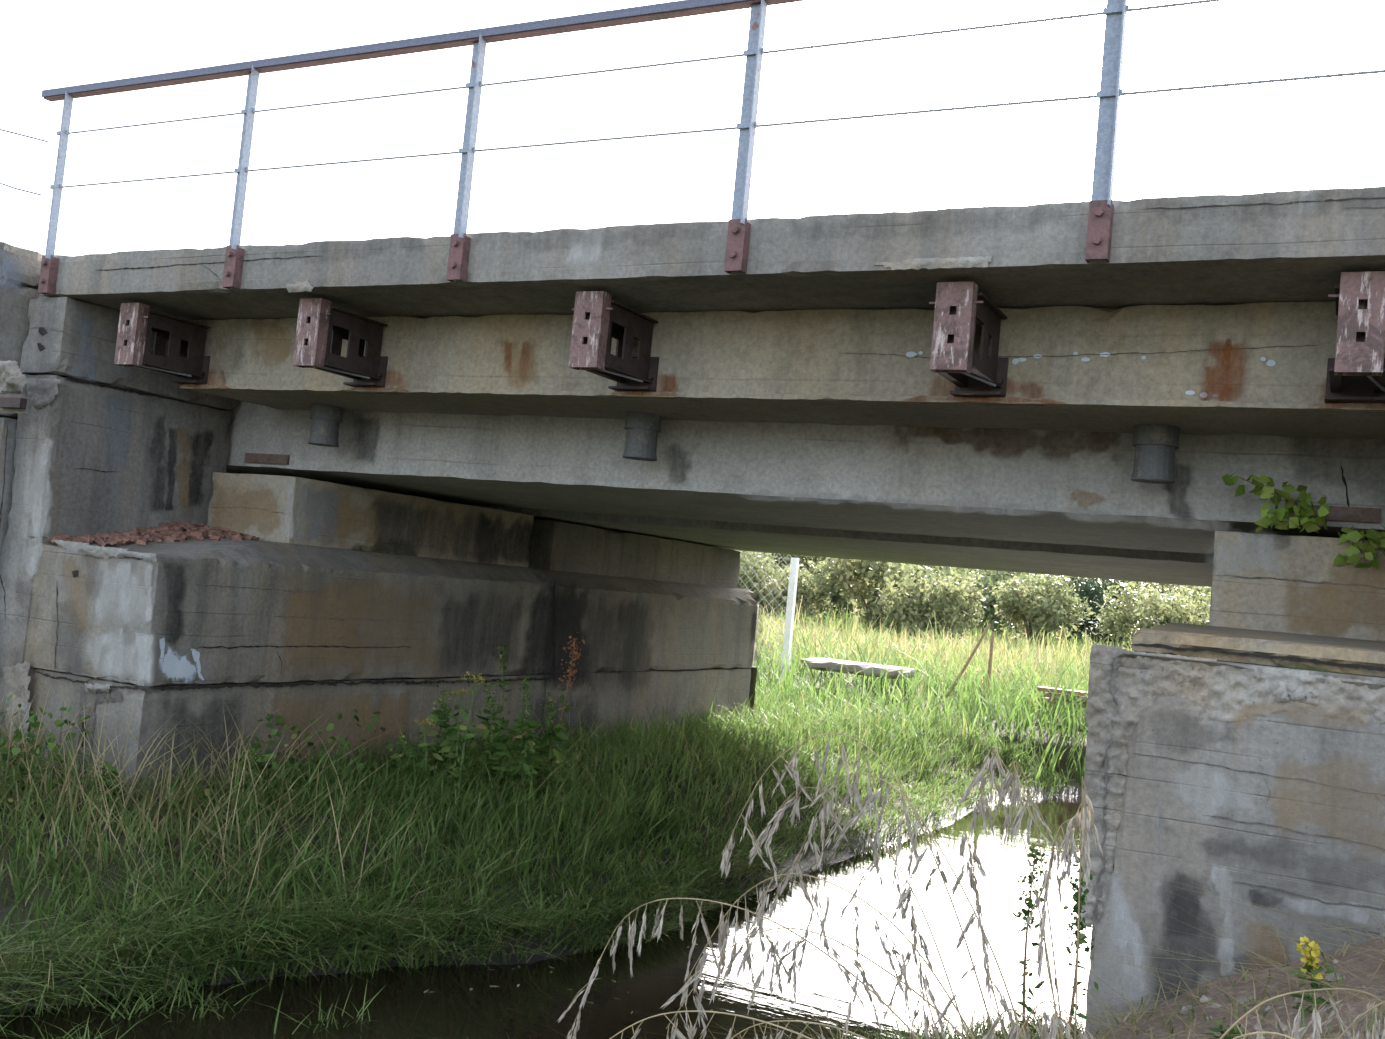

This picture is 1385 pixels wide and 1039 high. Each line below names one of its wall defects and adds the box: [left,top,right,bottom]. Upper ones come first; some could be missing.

rust [1206,339,1243,400]
water stain [153,421,334,540]
rust [922,427,1116,456]
peeling [191,649,204,680]
crack [35,590,551,770]
spalling [1080,644,1385,928]
water stain [1113,866,1232,1001]